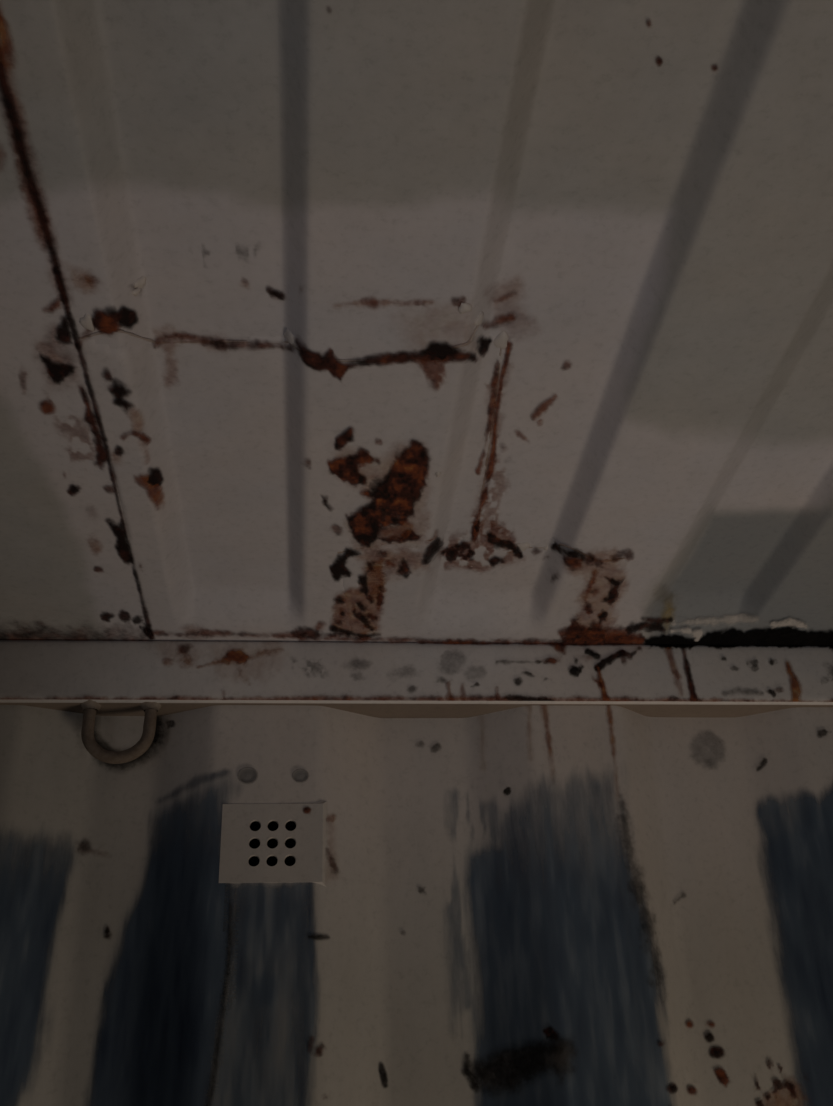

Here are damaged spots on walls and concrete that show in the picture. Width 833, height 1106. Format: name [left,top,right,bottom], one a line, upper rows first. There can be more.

rust [0,13,257,654]
rust [154,315,515,389]
rust [0,343,833,752]
peeling [671,614,757,641]
peeling [771,619,806,628]
rust [756,1060,797,1106]